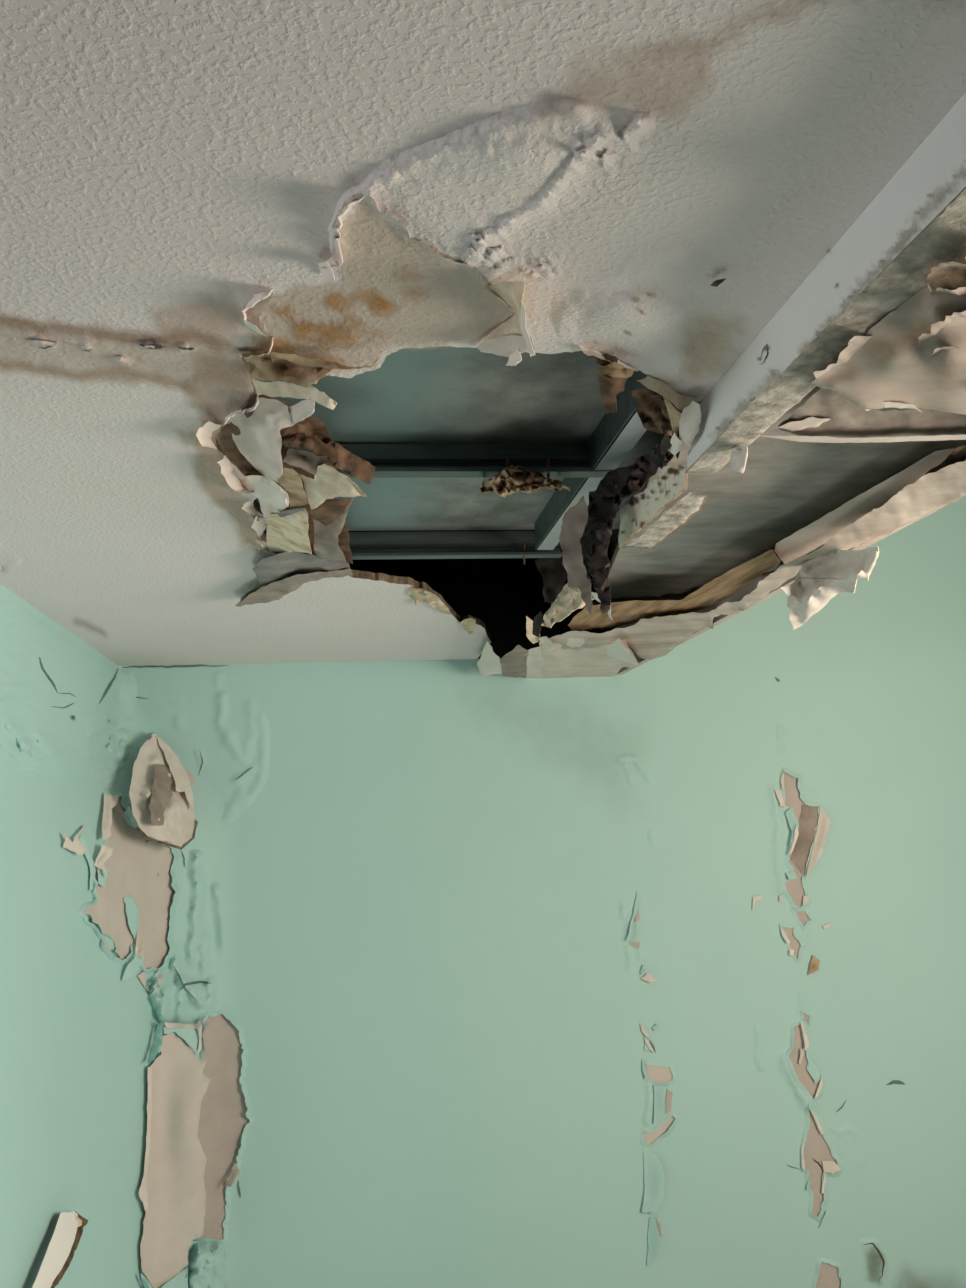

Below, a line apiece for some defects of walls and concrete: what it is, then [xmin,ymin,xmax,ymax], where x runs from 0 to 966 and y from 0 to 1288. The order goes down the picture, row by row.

peeling [802,169,964,352]
leakage [0,319,226,348]
leakage [197,366,256,539]
spalling [607,465,683,562]
spalling [349,558,614,659]
peeling [780,546,879,630]
peeling [616,893,657,983]
peeling [752,720,869,1228]
peeling [63,790,254,1288]
peeling [640,1024,680,1266]
peeling [811,1258,848,1288]
peeling [858,1237,890,1288]